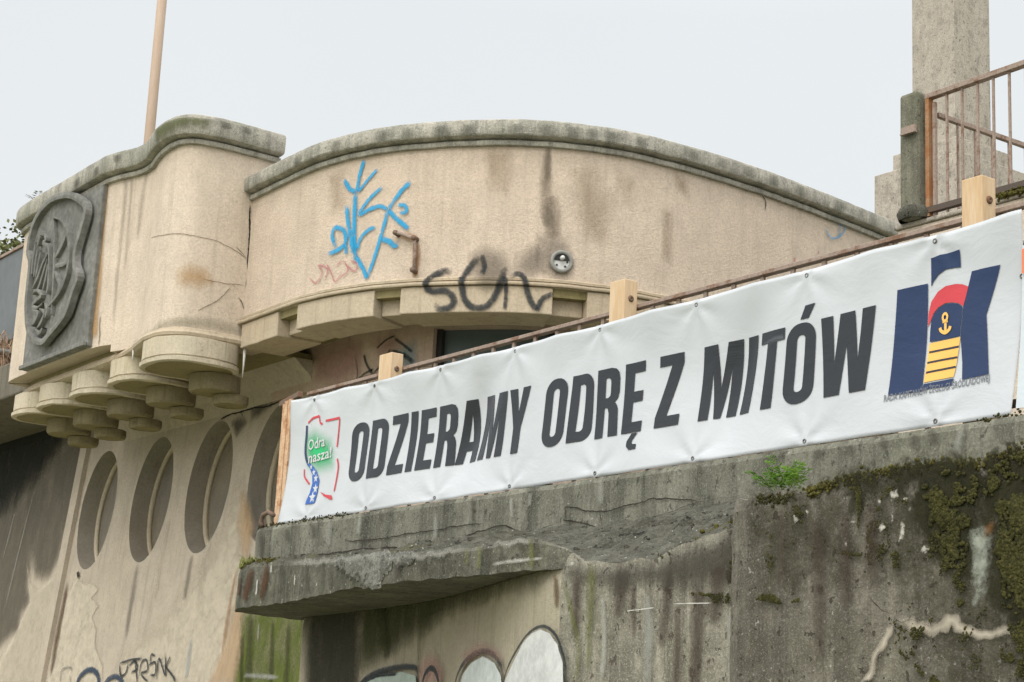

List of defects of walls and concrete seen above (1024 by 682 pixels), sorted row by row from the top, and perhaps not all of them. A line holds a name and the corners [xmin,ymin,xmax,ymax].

crack [151,208,251,312]
leakage [0,430,80,641]
crack [295,523,515,556]
crack [543,493,747,528]
leakage [571,535,732,682]
leakage [972,529,989,602]